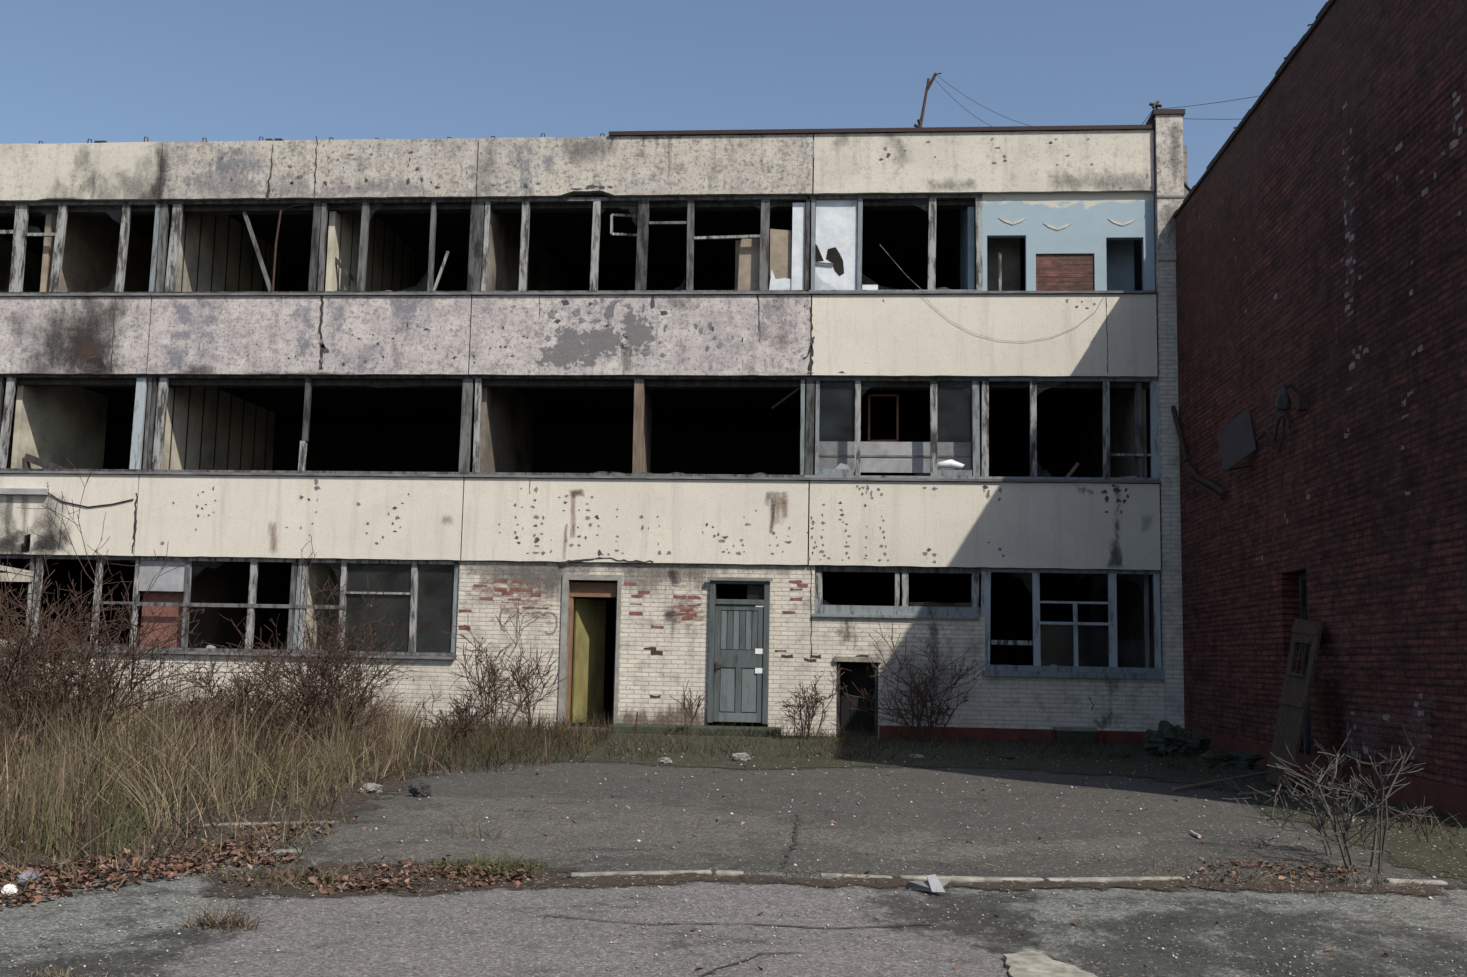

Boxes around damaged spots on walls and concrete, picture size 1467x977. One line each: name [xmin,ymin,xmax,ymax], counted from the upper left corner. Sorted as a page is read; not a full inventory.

leakage [36,299,117,374]
crack [318,295,329,370]
peeling [522,295,676,370]
peeling [694,322,723,351]
leakage [0,499,67,553]
flaking render [458,487,624,630]
flaking render [624,577,701,629]